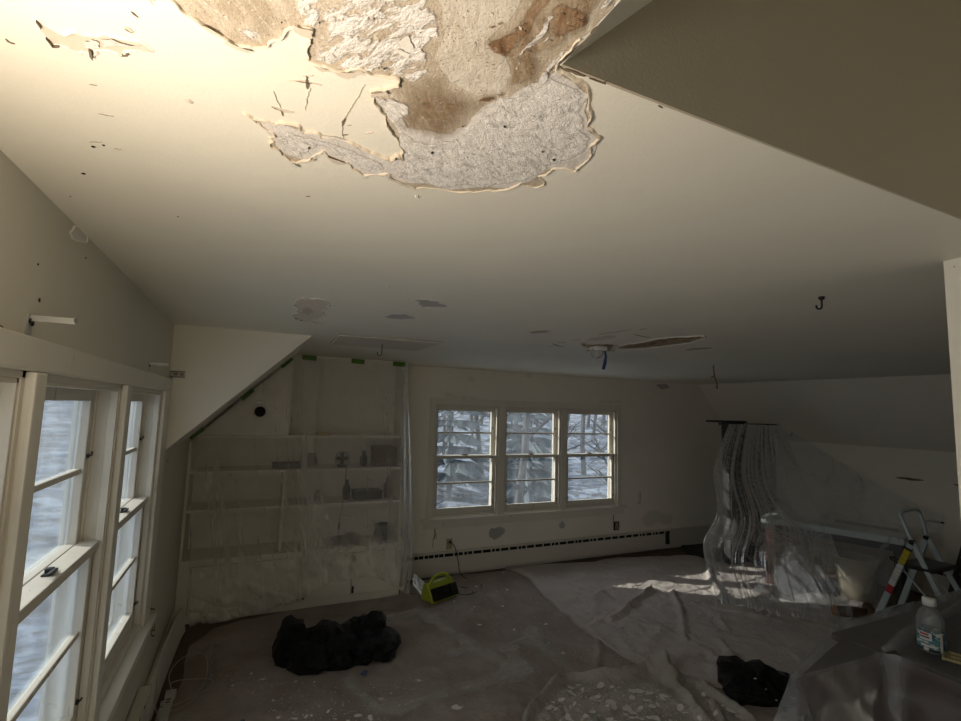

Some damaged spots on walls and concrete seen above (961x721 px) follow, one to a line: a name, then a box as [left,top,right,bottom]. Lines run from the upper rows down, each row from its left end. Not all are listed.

peeling [33,17,155,61]
crack [273,75,322,110]
crack [342,84,373,139]
peeling [170,0,616,194]